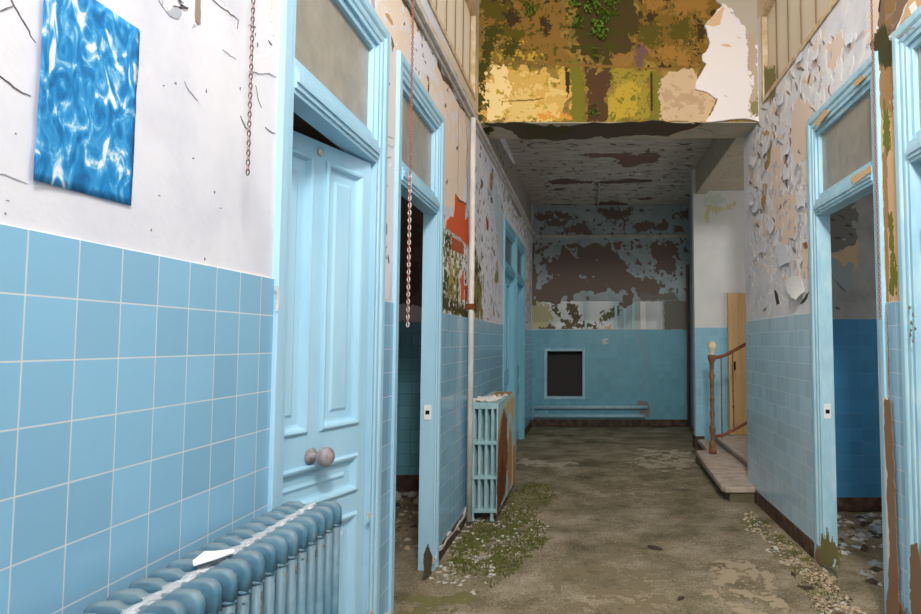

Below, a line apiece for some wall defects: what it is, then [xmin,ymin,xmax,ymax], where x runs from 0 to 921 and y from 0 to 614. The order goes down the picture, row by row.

crack [0,76,31,96]
crack [0,0,36,43]
crack [213,0,271,44]
water stain [478,0,707,122]
peeling [368,0,879,330]
flaking render [881,112,917,343]
peeling [882,396,890,580]